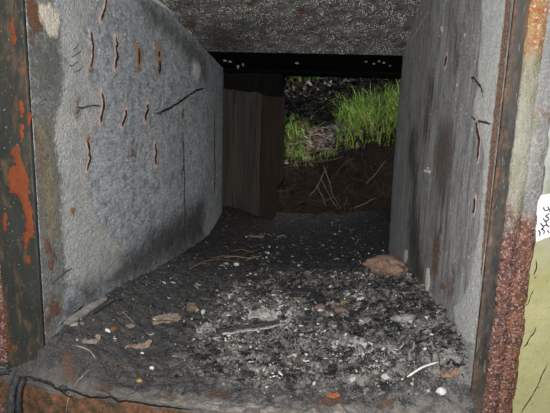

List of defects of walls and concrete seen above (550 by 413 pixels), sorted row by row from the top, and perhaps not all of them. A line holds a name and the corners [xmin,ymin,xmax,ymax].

crack [471,76,484,97]
crack [156,88,204,114]
crack [22,376,185,409]